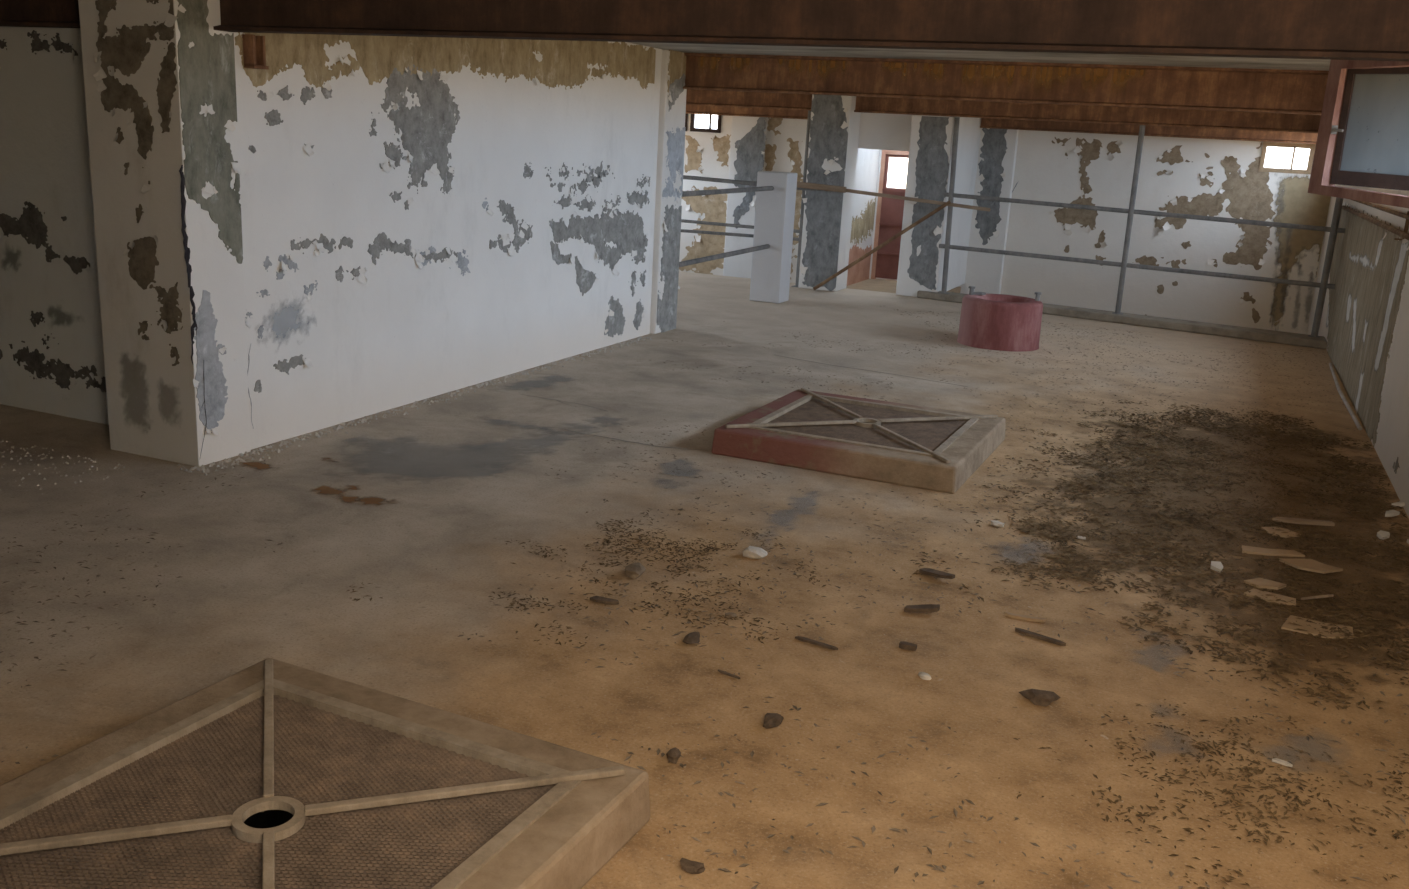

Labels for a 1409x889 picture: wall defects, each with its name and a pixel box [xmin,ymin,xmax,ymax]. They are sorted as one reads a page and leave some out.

peeling [0,201,90,275]
peeling [27,0,686,436]
peeling [482,94,876,337]
peeling [906,116,949,292]
peeling [975,128,1008,245]
peeling [1048,137,1123,266]
peeling [1132,142,1278,294]
peeling [1240,292,1261,323]
peeling [1327,203,1409,447]
rust [313,485,393,505]